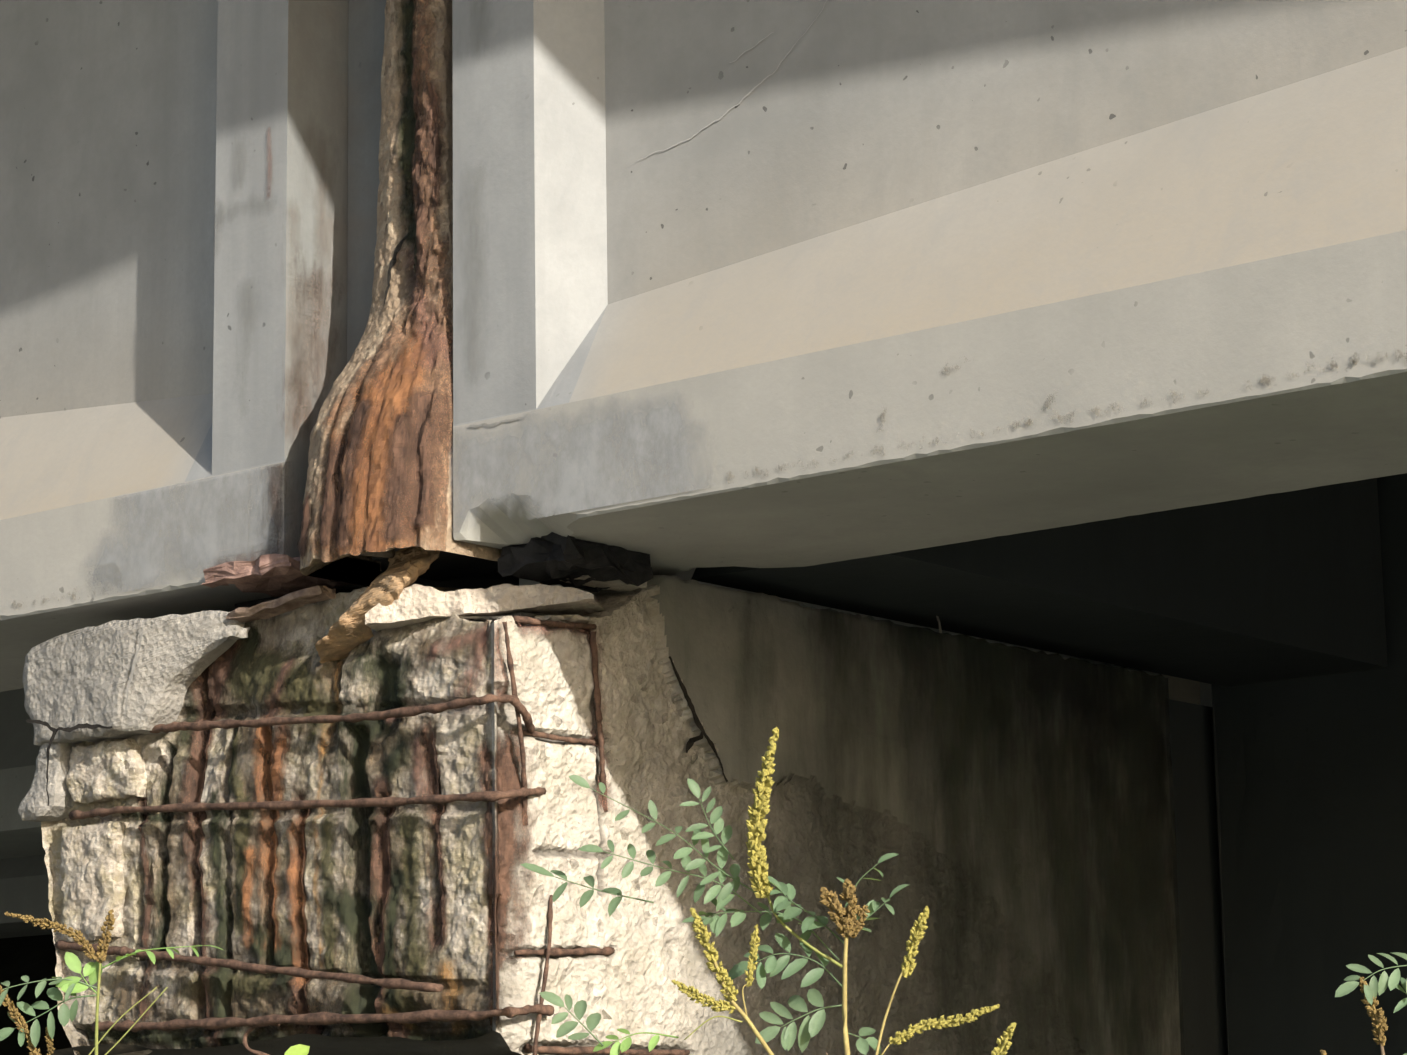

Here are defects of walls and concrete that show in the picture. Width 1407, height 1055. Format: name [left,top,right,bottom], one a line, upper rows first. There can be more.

rust [252,0,453,561]
rust [137,795,155,1020]
rust [180,640,238,1046]
damp [79,620,492,1048]
rust [242,658,342,1035]
rust [370,777,411,1038]
rust [414,719,460,1028]
rust [478,730,534,1030]
spalling [18,575,1086,1055]
rust [592,700,608,807]